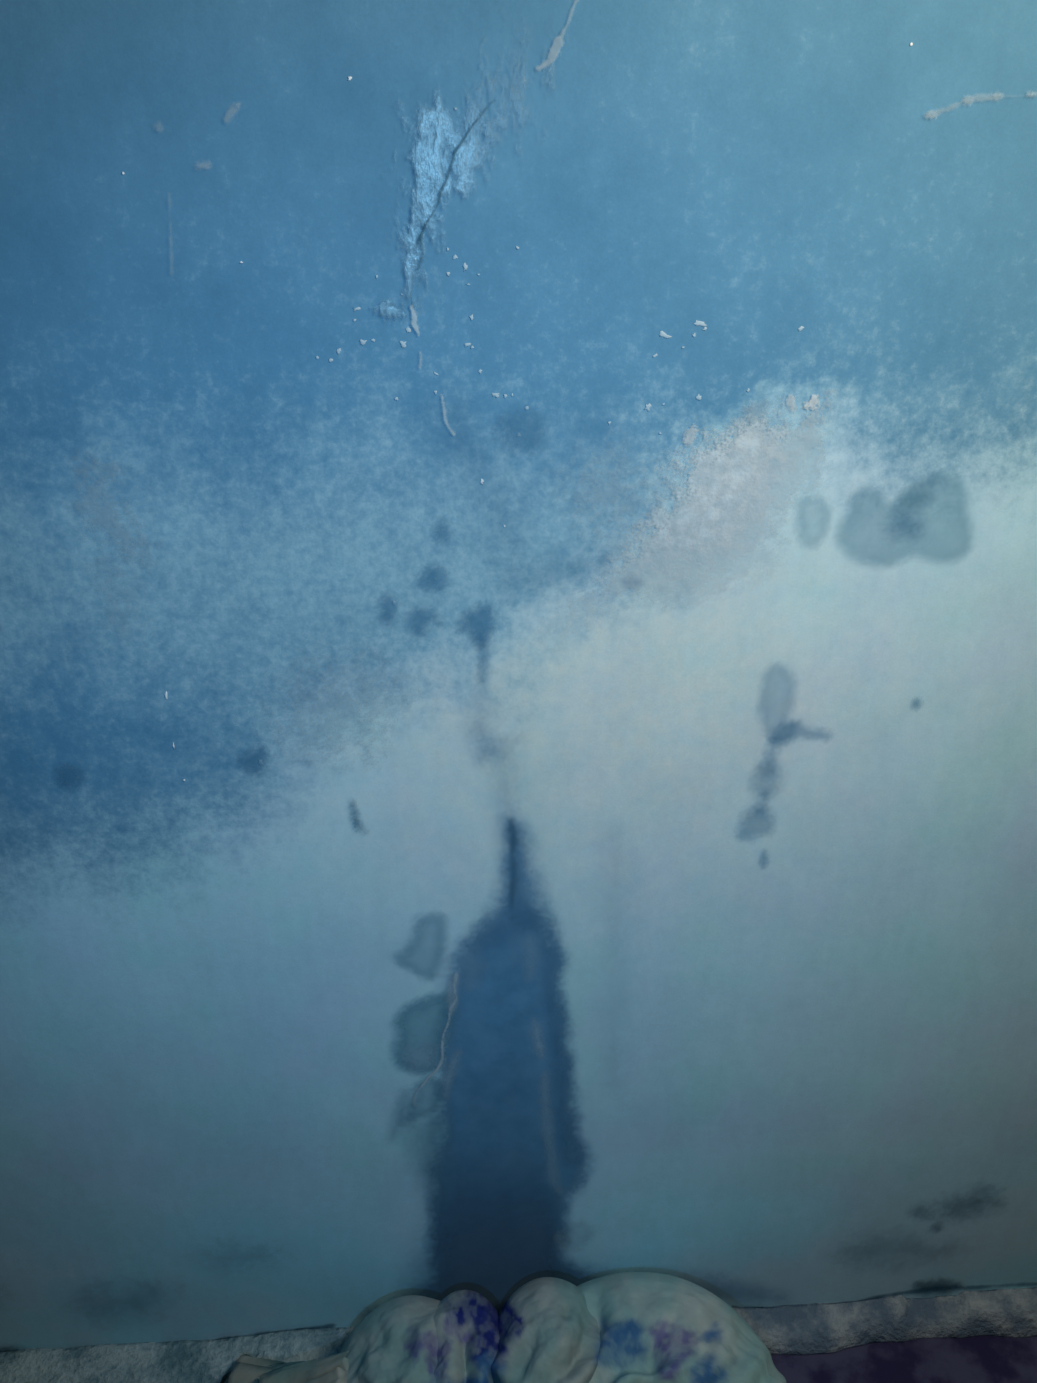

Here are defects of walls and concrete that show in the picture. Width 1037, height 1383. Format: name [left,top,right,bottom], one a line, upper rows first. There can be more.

crack [418,124,474,242]
crack [410,305,419,333]
damp [397,834,590,1313]